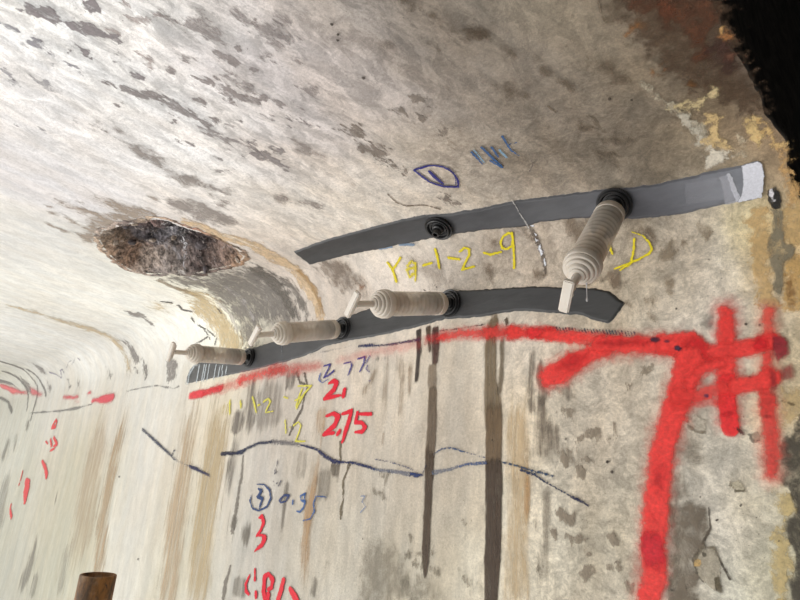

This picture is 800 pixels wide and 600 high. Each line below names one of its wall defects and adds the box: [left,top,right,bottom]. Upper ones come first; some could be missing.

corrosion [615,0,768,114]
spalling [93,216,250,277]
crack [527,225,547,274]
leakage [399,326,439,577]
leakage [484,314,508,600]